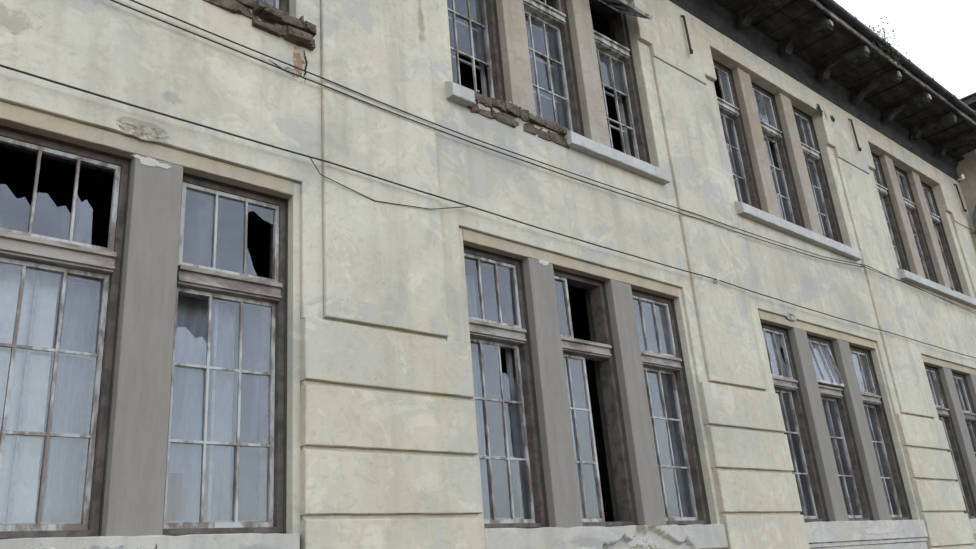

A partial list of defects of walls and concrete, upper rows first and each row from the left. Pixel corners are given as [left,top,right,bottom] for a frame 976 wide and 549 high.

spalling [203,0,316,80]
spalling [467,89,569,149]